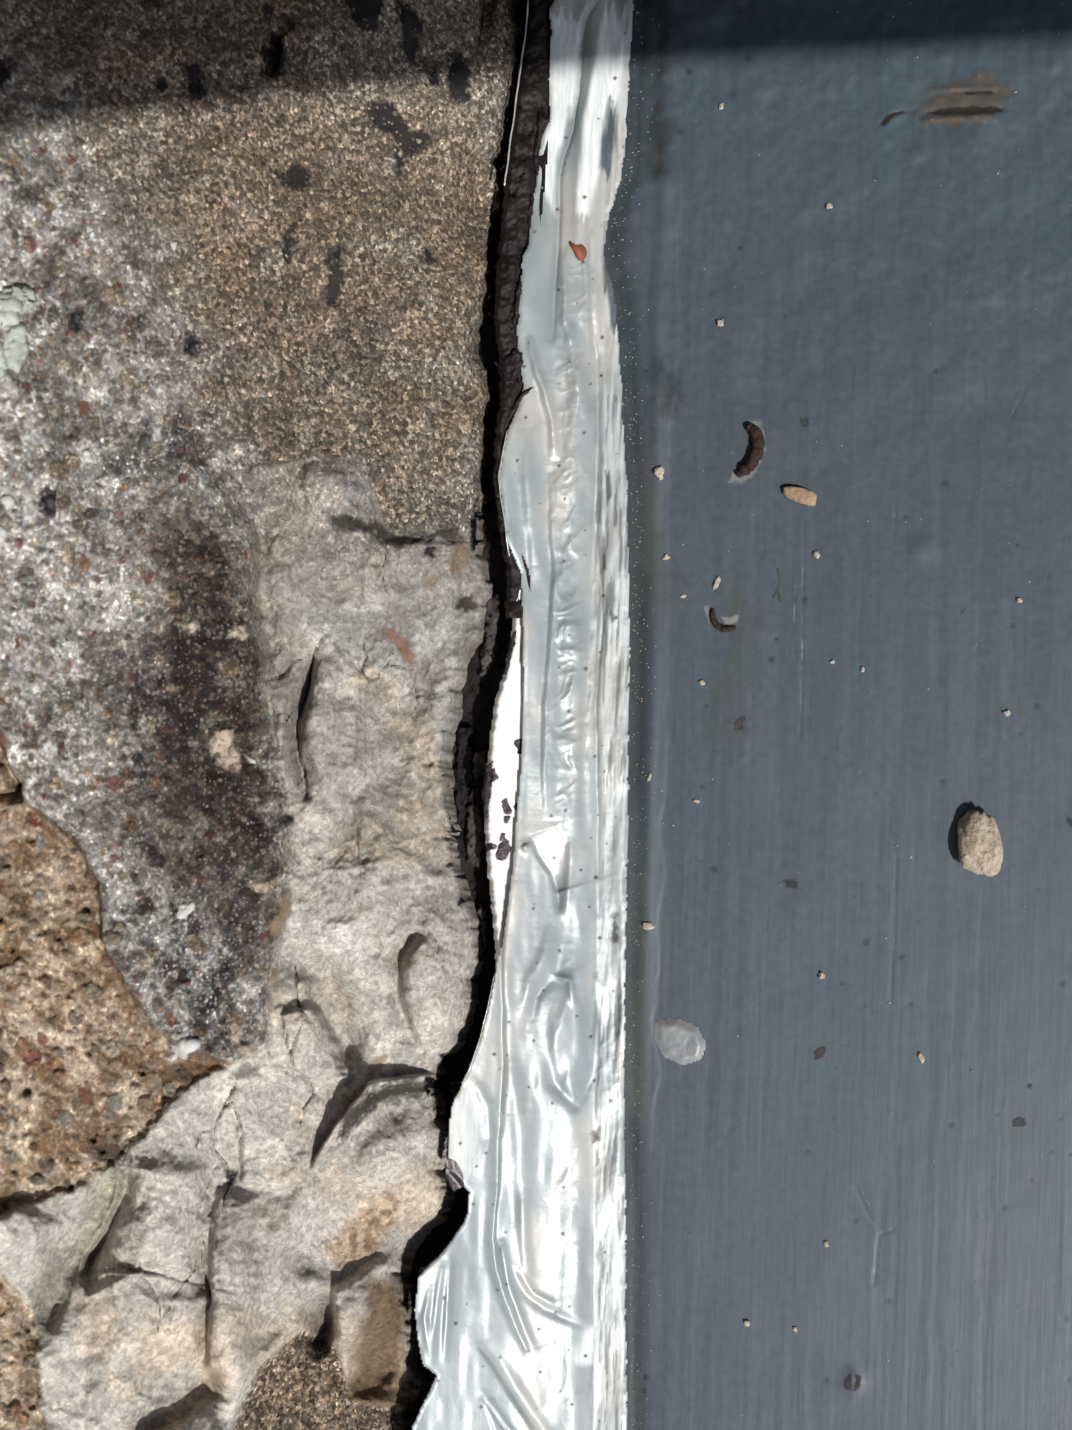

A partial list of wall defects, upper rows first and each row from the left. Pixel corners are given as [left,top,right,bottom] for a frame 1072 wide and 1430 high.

crack [285,966,313,1125]